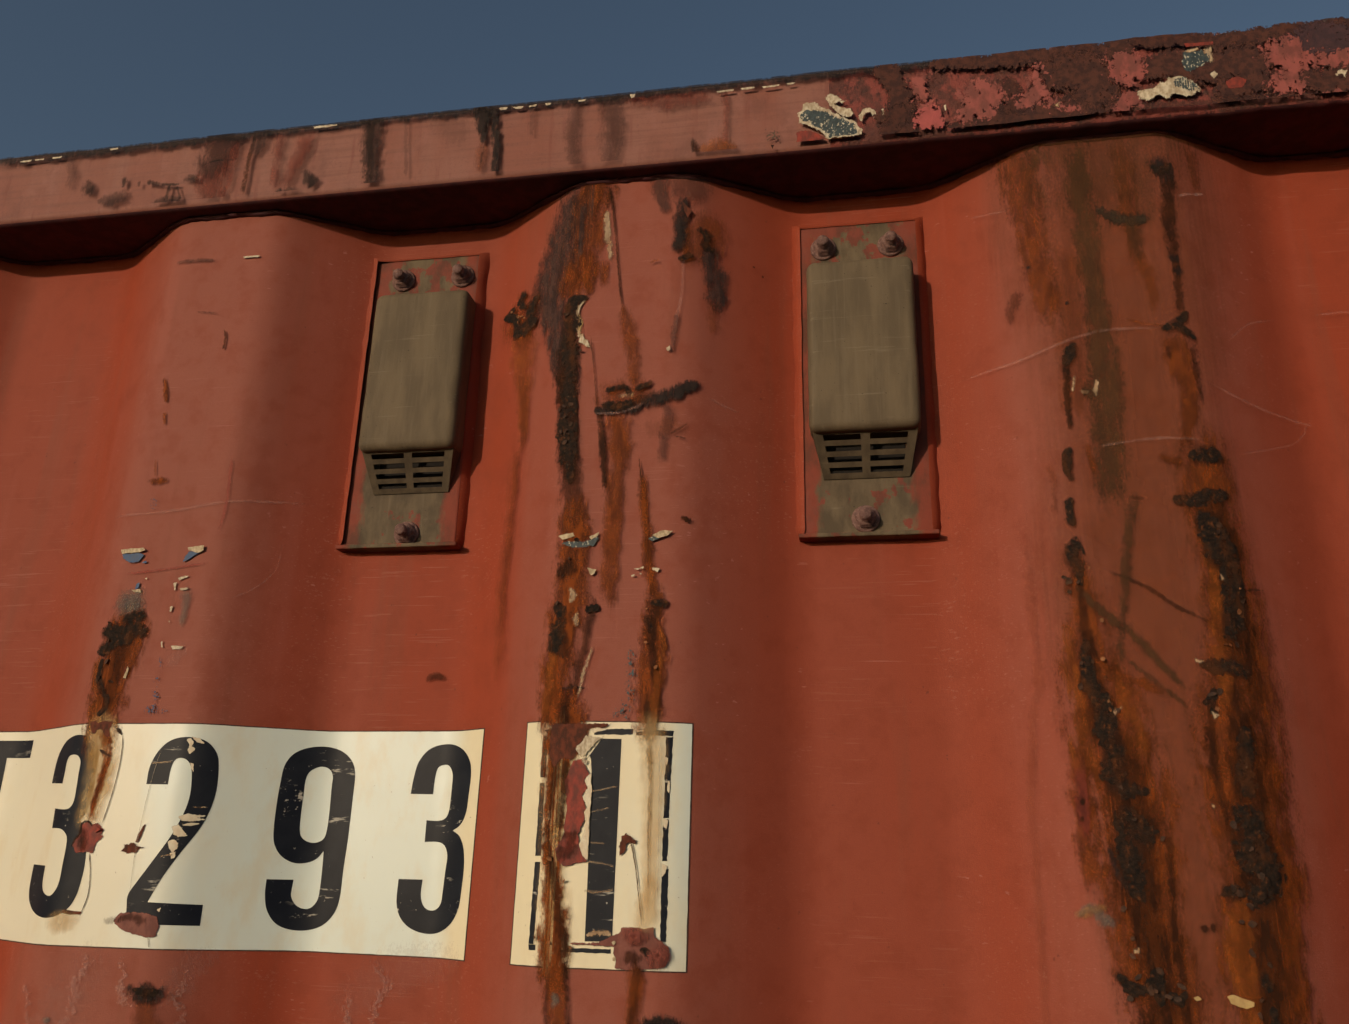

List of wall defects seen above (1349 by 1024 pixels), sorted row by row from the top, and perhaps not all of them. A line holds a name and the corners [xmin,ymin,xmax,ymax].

peeling [1099,41,1246,112]
peeling [1252,33,1349,97]
peeling [121,548,147,589]
peeling [183,545,204,562]
corrosion [504,183,639,1024]
corrosion [1059,157,1321,1024]
corrosion [81,589,151,820]
corrosion [631,459,670,883]
peeling [555,735,603,866]
corrosion [126,982,164,1004]
peeling [570,833,670,1024]
corrosion [642,1015,678,1024]